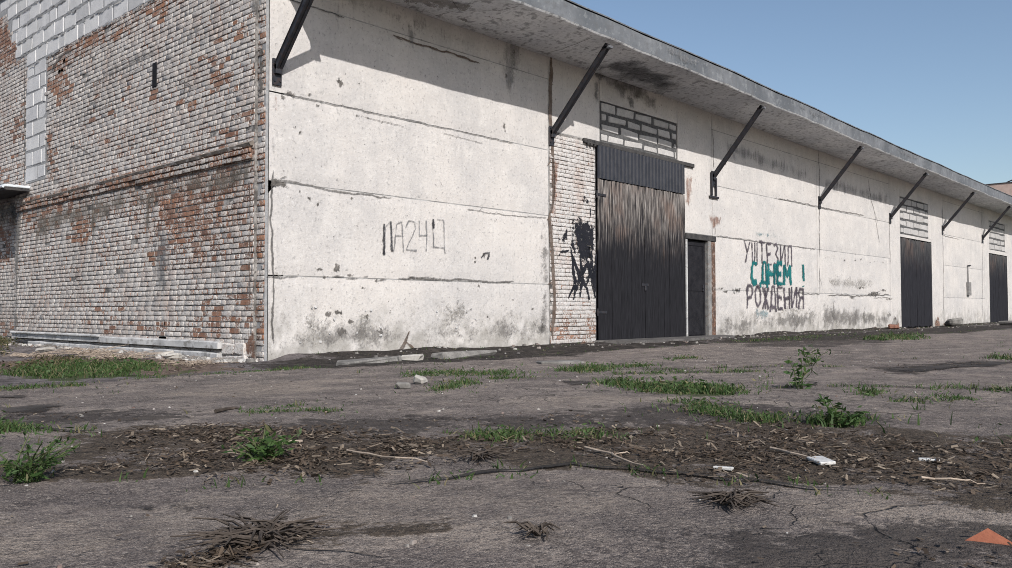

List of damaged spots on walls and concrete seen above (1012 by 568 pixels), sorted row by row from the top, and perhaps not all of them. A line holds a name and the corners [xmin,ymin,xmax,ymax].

peeling [146,0,167,25]
peeling [0,18,17,76]
peeling [47,24,130,107]
peeling [22,198,99,245]
peeling [147,195,253,270]
leakage [321,327,388,346]
leakage [771,313,812,330]
leakage [825,305,887,325]